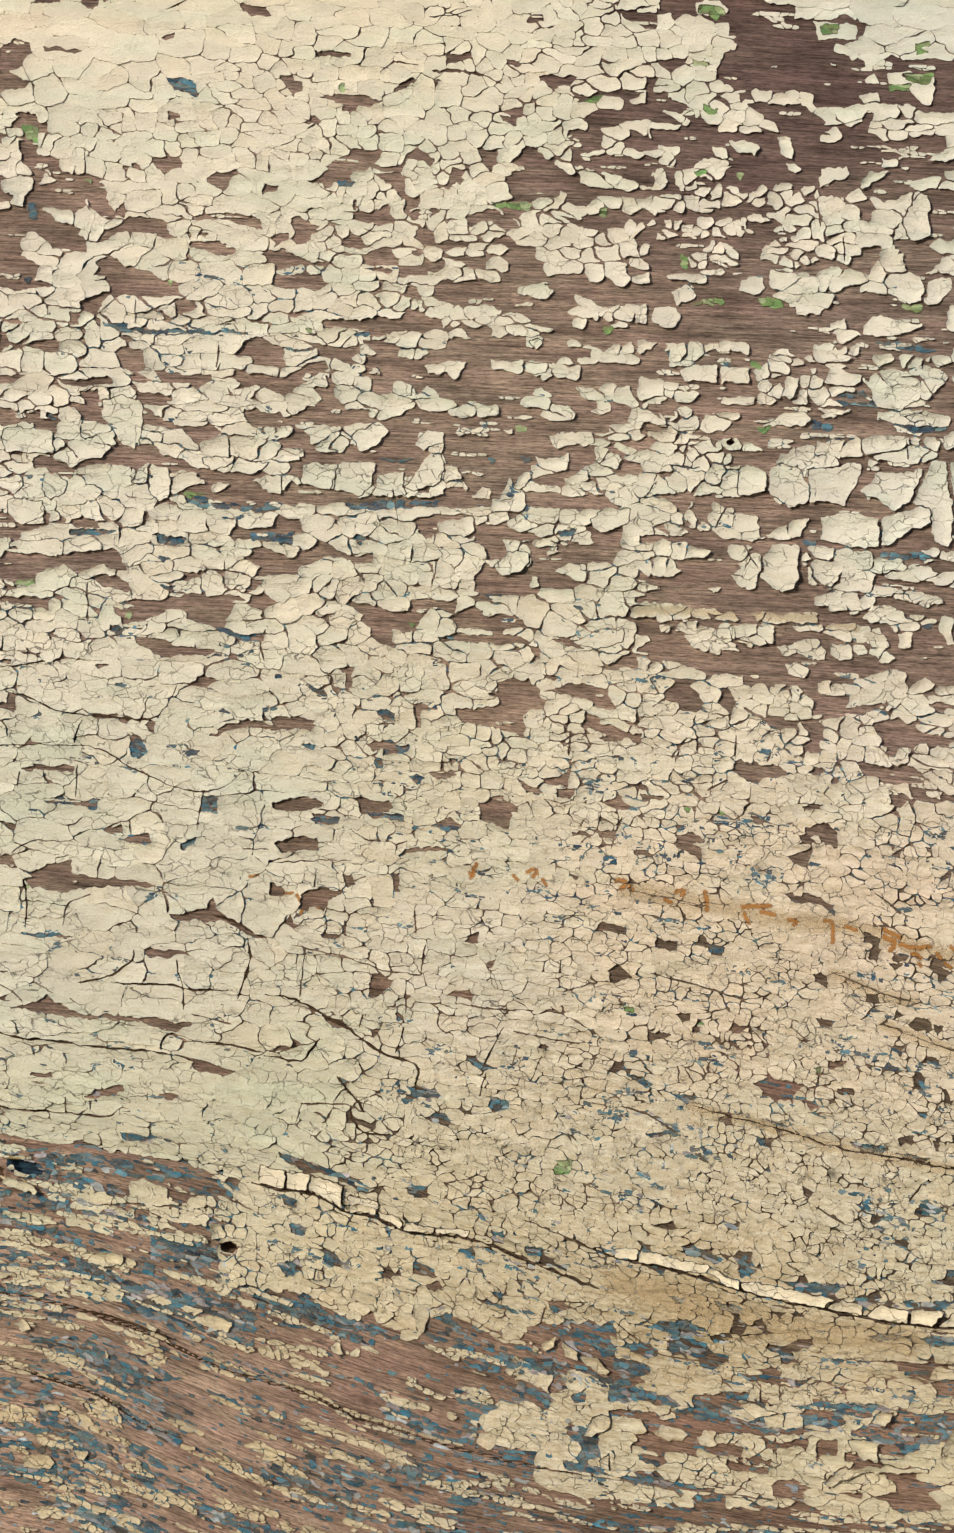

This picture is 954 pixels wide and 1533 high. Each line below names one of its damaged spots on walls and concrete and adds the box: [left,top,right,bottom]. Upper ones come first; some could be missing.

crack [814,0,954,210]
crack [532,191,650,284]
crack [580,135,792,276]
crack [760,184,908,277]
peeling [0,0,954,867]
crack [704,319,954,471]
crack [561,382,943,665]
crack [0,1228,180,1378]
crack [0,1395,205,1533]
crack [135,1294,463,1479]
crack [406,1343,954,1533]
peeling [509,1308,954,1486]